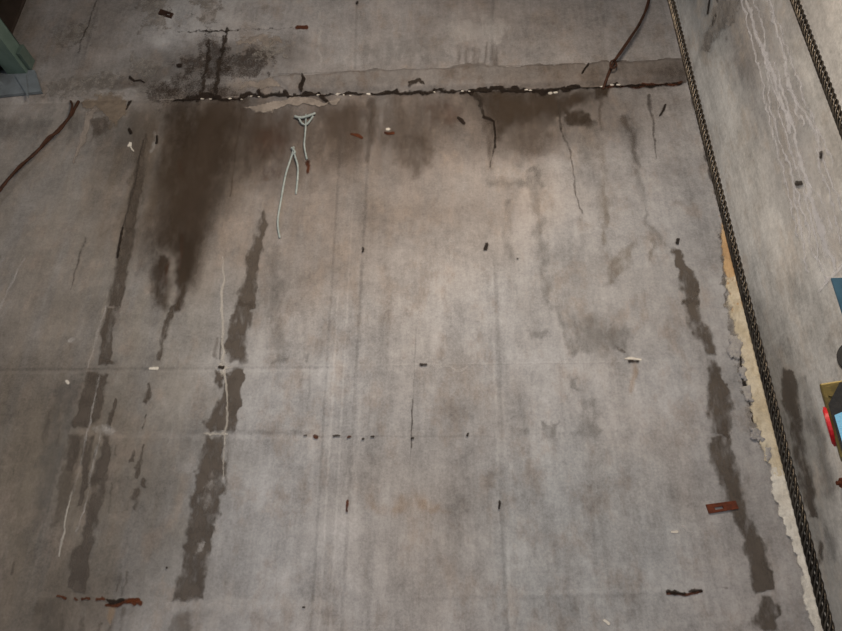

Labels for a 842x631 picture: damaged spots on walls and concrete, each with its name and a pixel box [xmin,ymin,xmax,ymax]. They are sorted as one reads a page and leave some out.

leakage [66,128,158,593]
leakage [149,101,243,370]
leakage [173,211,268,601]
crack [173,63,682,153]
leakage [481,92,592,133]
leakage [672,249,781,631]
spalling [719,233,772,462]
leakage [721,224,823,631]
rust [56,595,142,607]